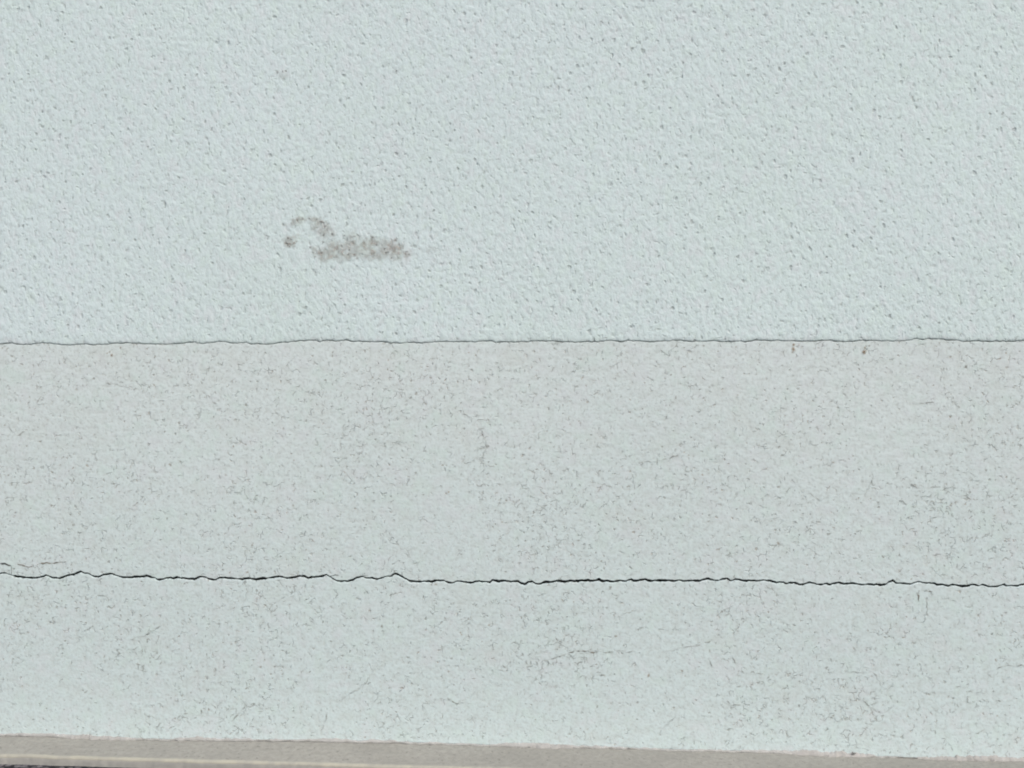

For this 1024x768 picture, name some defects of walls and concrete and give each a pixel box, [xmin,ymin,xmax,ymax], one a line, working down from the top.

crack [0,562,1024,601]